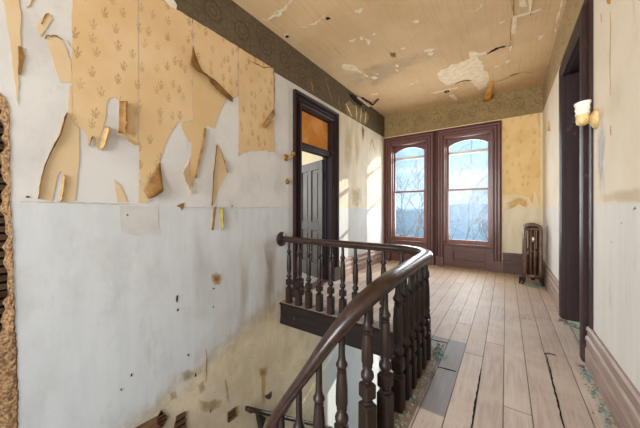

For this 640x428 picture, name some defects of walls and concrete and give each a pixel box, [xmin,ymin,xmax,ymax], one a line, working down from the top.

flaking render [499,0,541,43]
spalling [37,13,72,83]
crack [487,44,512,54]
flaking render [432,51,489,101]